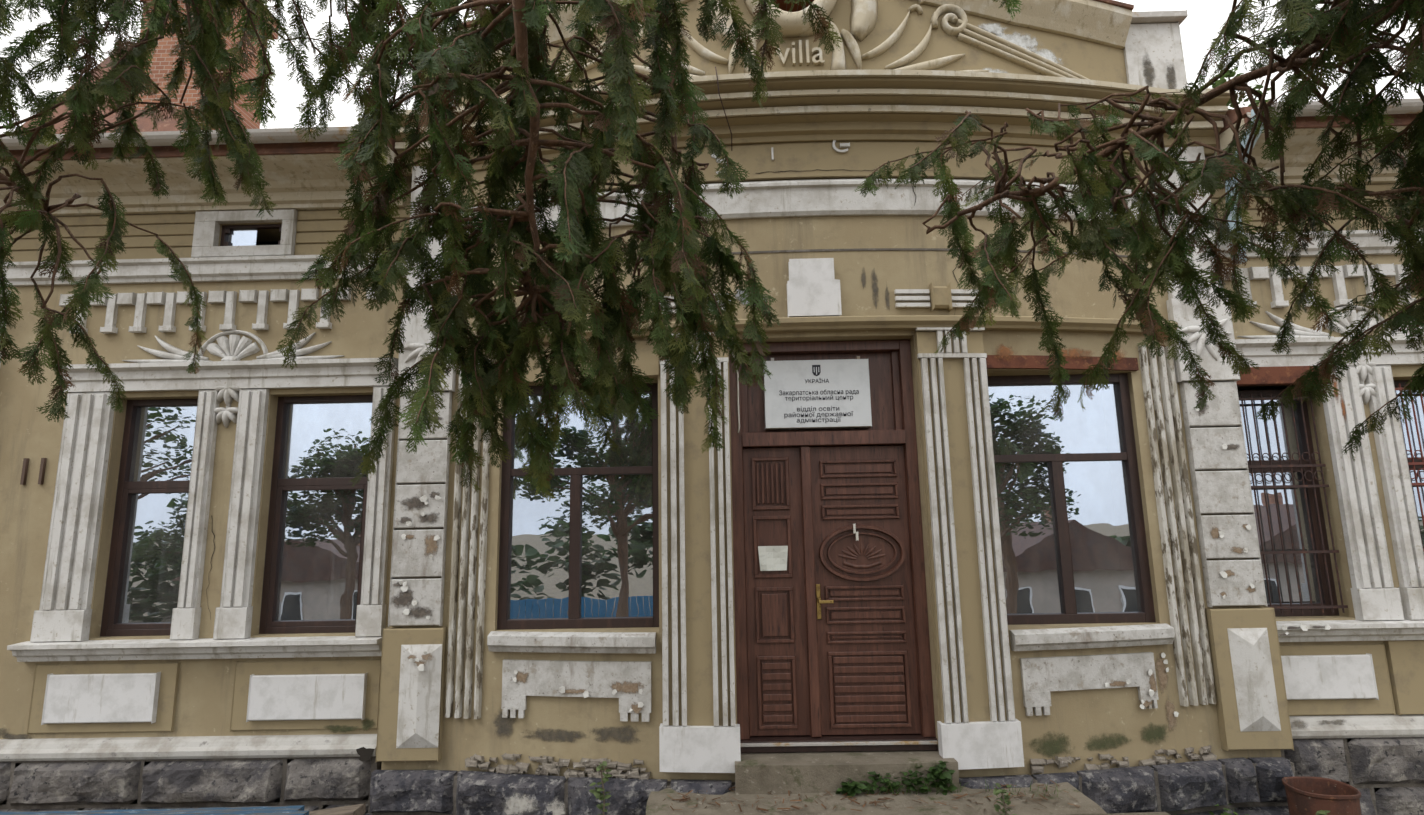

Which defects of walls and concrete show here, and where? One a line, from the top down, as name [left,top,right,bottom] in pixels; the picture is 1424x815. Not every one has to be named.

peeling [399,492,441,558]
peeling [392,580,432,619]
peeling [513,669,528,683]
peeling [559,686,589,698]
peeling [611,681,644,714]
flaking render [1140,653,1179,729]
flaking render [1030,745,1217,774]